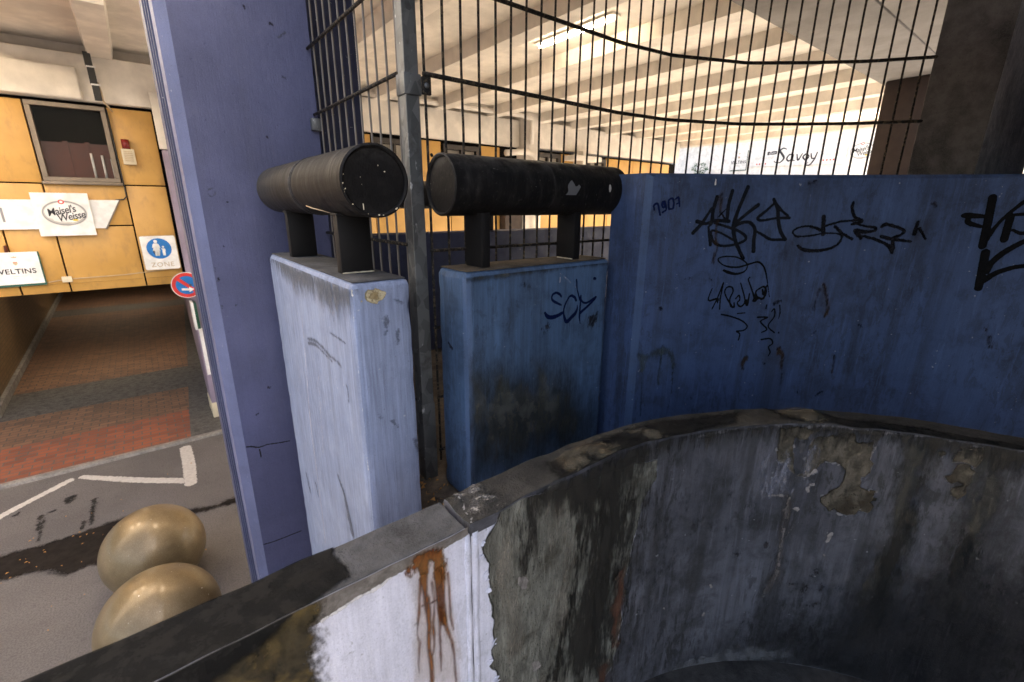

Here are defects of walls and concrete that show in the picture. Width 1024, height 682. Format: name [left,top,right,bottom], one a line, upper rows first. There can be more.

peeling [351,288,386,304]
crack [247,440,290,457]
peeling [698,425,878,517]
peeling [944,440,985,499]
rust [405,548,456,682]
damp [497,504,538,621]
damp [546,482,658,682]